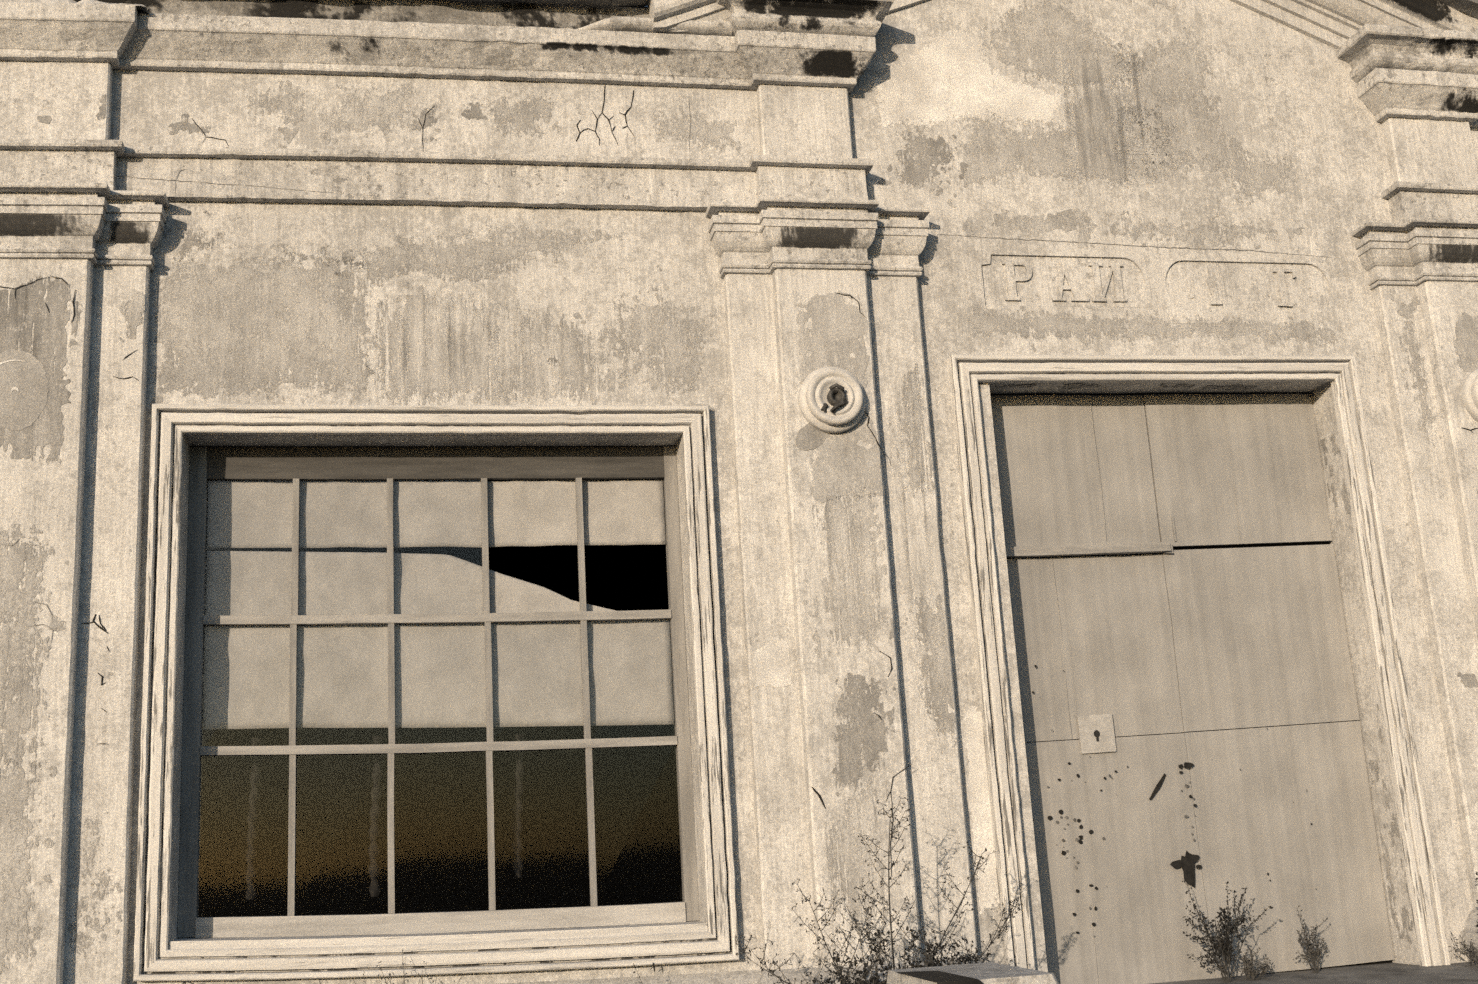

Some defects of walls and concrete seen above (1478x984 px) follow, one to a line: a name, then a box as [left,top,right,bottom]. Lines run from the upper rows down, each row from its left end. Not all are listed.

crack [576,87,635,145]
spalling [0,275,82,464]
spalling [796,290,870,388]
peeling [796,363,957,747]
peeling [819,673,895,935]